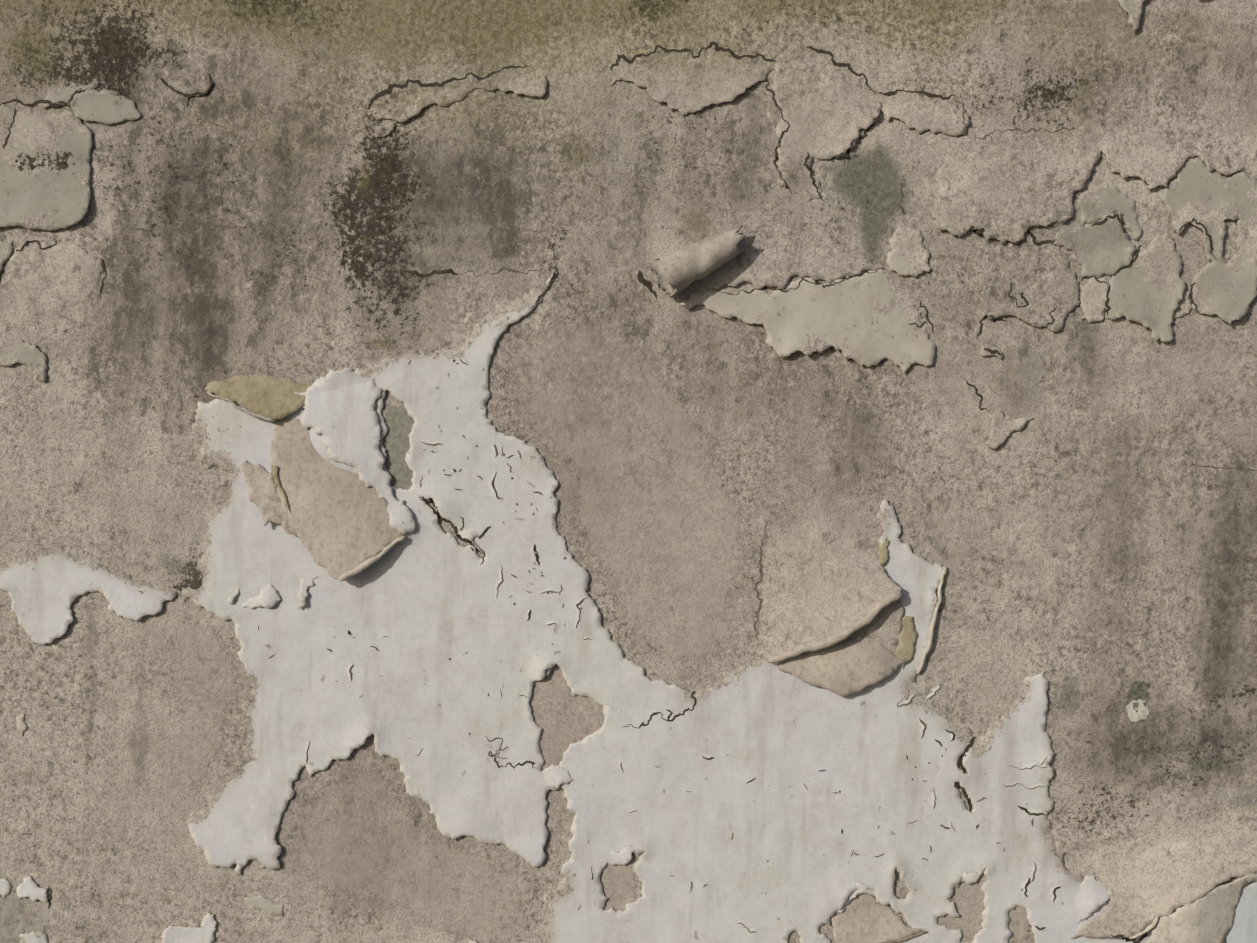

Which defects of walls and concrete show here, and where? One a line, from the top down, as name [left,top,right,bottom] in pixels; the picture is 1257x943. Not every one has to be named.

mould [49,27,169,98]
water stain [224,0,358,35]
flaking render [369,72,547,137]
water stain [631,0,691,20]
flaking render [611,53,970,201]
peeling [0,80,142,334]
mould [330,131,420,297]
peeling [647,225,936,373]
flaking render [922,126,1257,342]
peeling [0,272,1257,943]